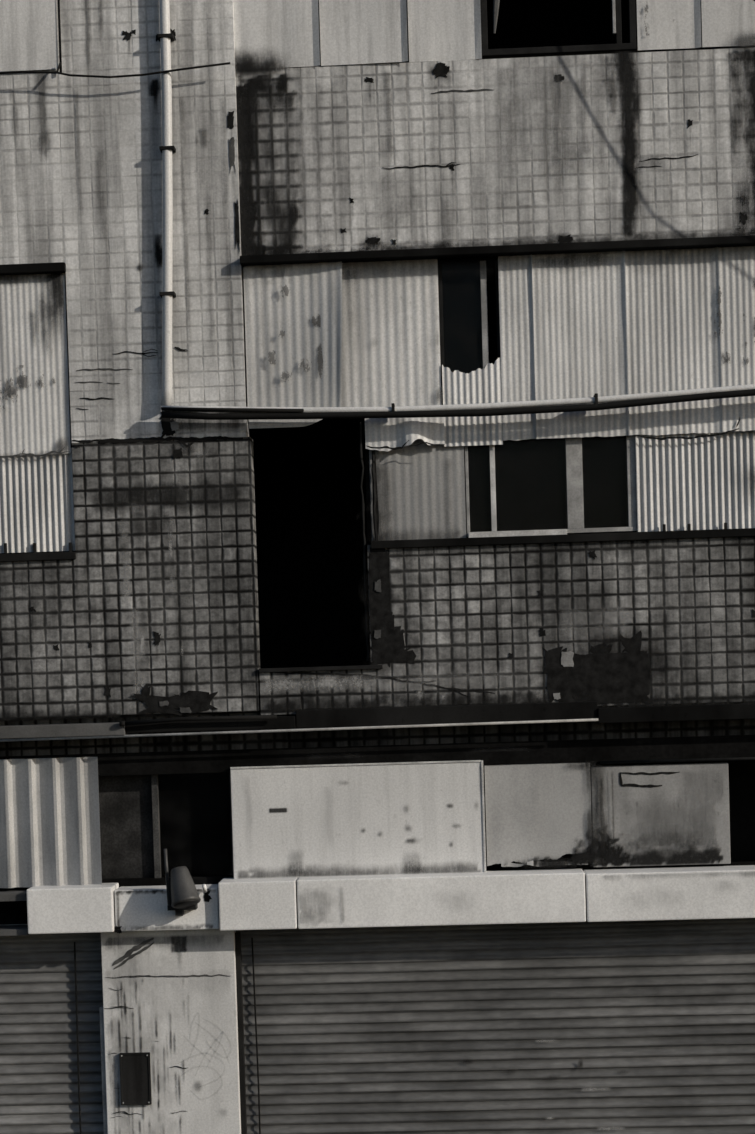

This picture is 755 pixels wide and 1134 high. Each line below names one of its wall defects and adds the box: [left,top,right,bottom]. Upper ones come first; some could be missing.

water stain [236,34,755,260]
corrosion [0,365,55,408]
corrosion [268,345,323,382]
spalling [369,548,416,667]
spalling [130,684,218,716]
spalling [539,628,650,705]
water stain [523,762,723,868]